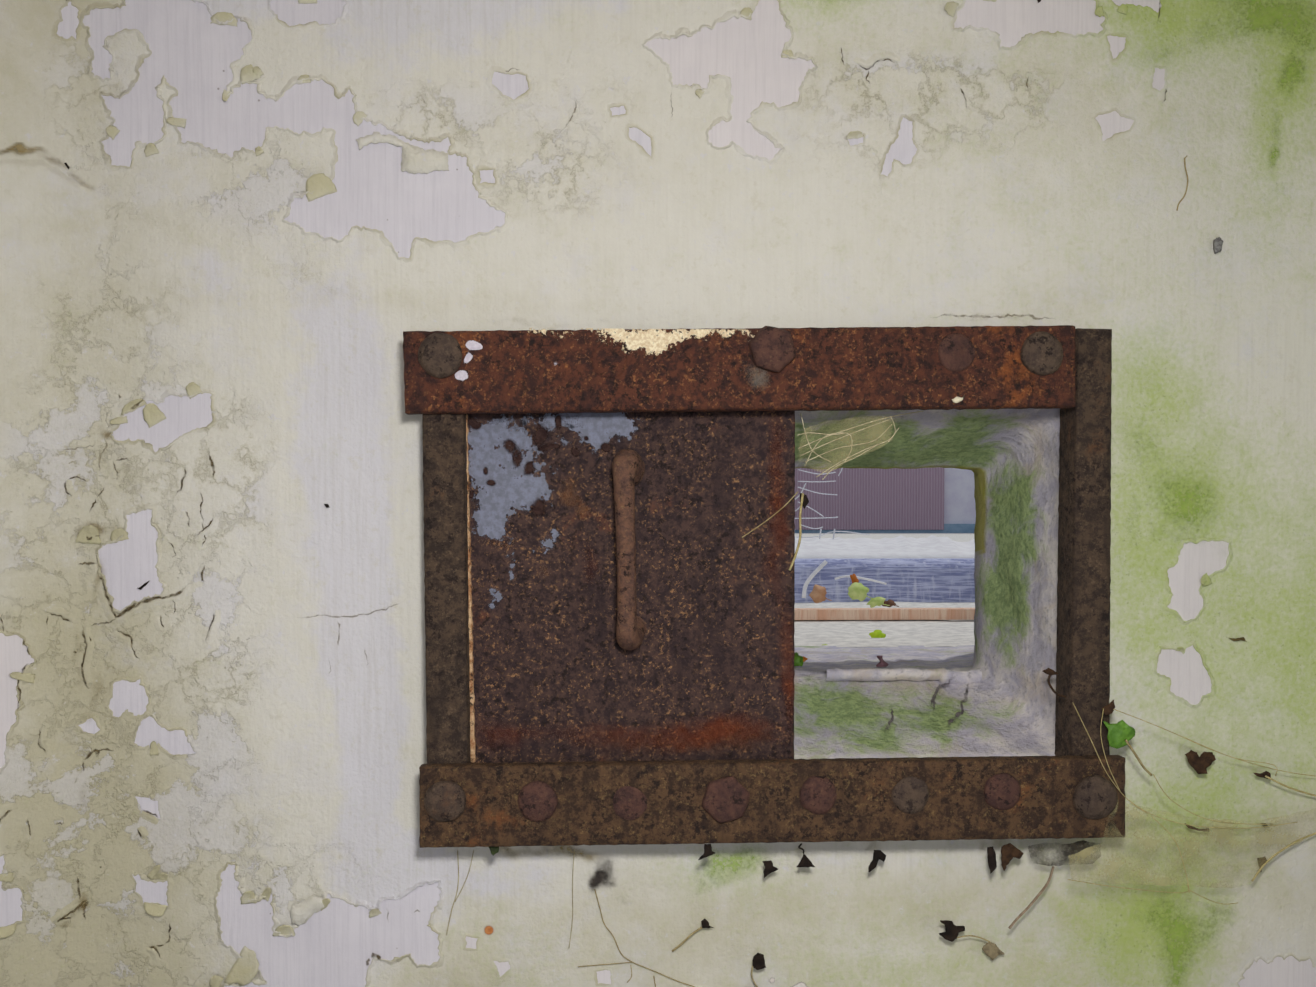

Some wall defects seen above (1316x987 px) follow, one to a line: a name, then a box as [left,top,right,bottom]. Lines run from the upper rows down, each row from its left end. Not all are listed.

peeling [945,0,1165,63]
peeling [51,0,509,263]
peeling [109,382,218,455]
corrosion [469,467,496,498]
corrosion [532,499,545,515]
corrosion [503,415,611,474]
peeling [76,502,169,614]
peeling [1160,535,1233,625]
peeling [0,628,37,775]
peeling [74,675,202,760]
peeling [1153,641,1216,708]
peeling [209,861,444,987]